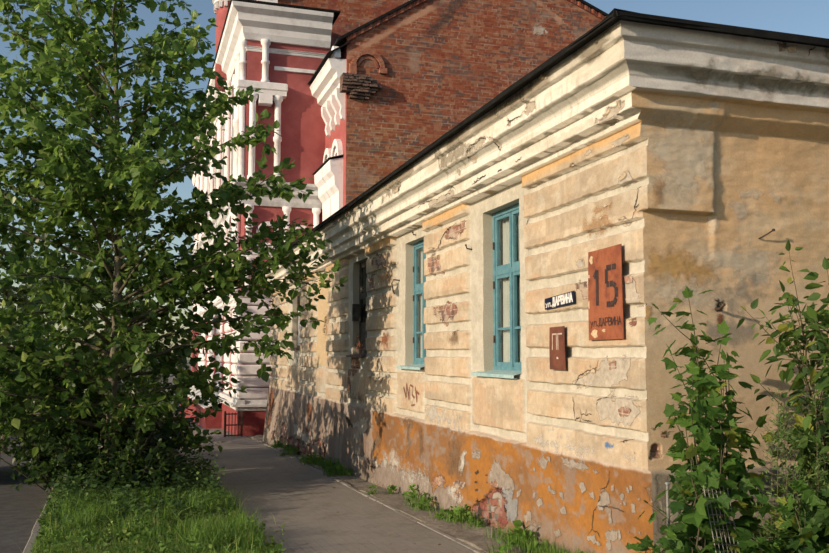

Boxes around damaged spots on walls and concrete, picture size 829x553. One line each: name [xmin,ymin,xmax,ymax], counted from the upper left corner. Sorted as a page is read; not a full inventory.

peeling [595,100,625,126]
flaking render [428,220,466,276]
flaking render [434,301,458,327]
flaking render [572,355,640,427]
flaking render [271,422,325,458]
flaking render [472,462,543,532]
crack [589,471,624,538]
peeling [579,482,640,550]